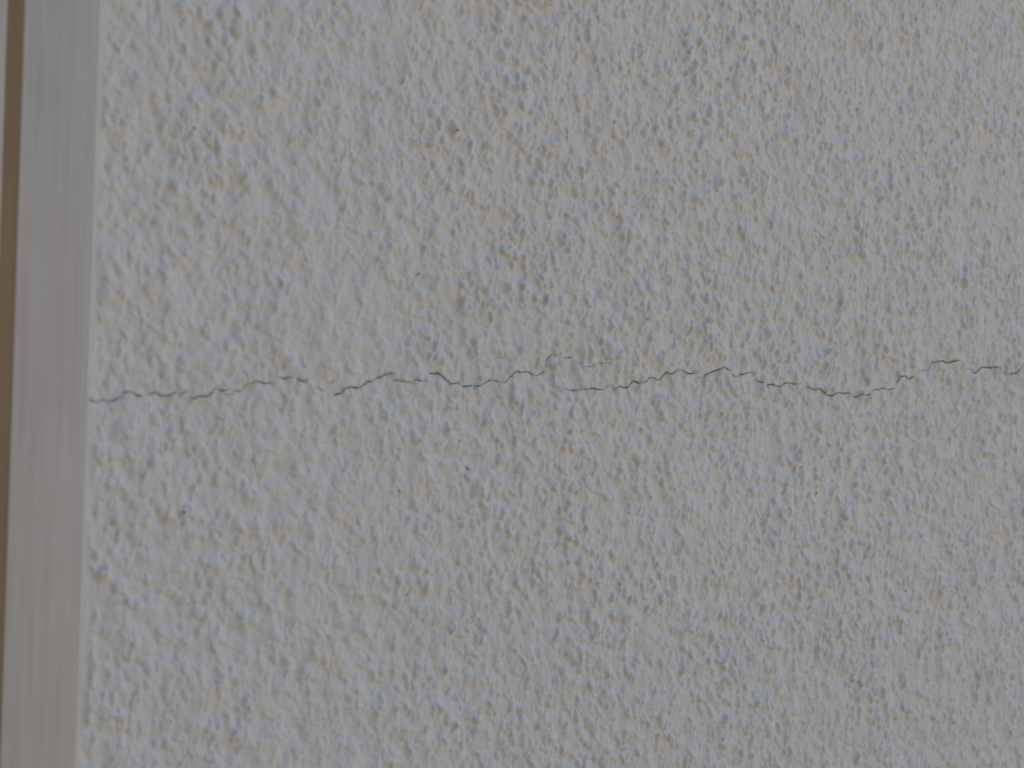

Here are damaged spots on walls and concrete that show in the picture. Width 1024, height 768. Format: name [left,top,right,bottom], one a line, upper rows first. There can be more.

crack [88,355,1024,402]